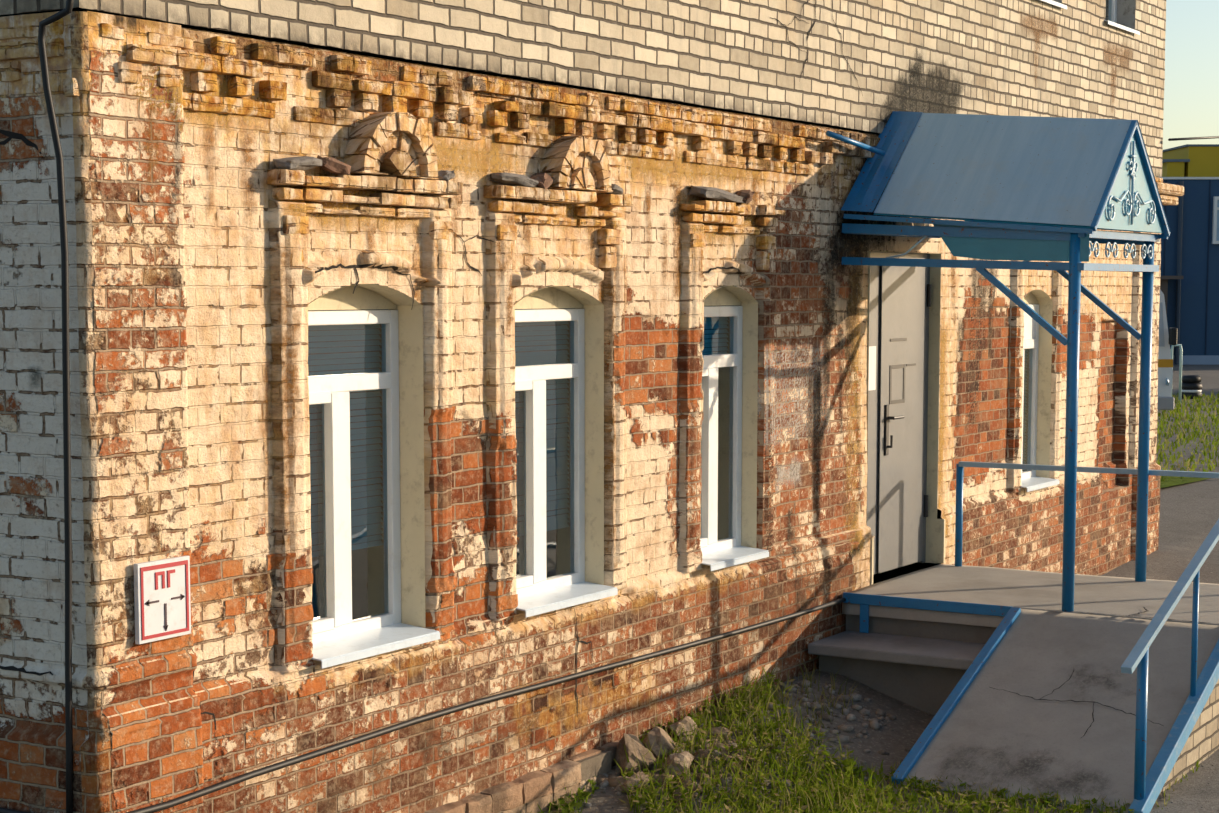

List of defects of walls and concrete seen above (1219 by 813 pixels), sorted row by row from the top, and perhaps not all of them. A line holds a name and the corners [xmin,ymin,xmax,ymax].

peeling [0,81,50,175]
peeling [88,50,200,413]
crack [315,263,415,310]
peeling [604,288,704,564]
peeling [949,277,1022,498]
peeling [1051,307,1127,492]
peeling [424,400,519,661]
crack [0,666,53,676]
peeling [0,699,88,811]
peeling [102,515,335,813]
spalling [357,667,396,688]
crack [990,670,1163,738]